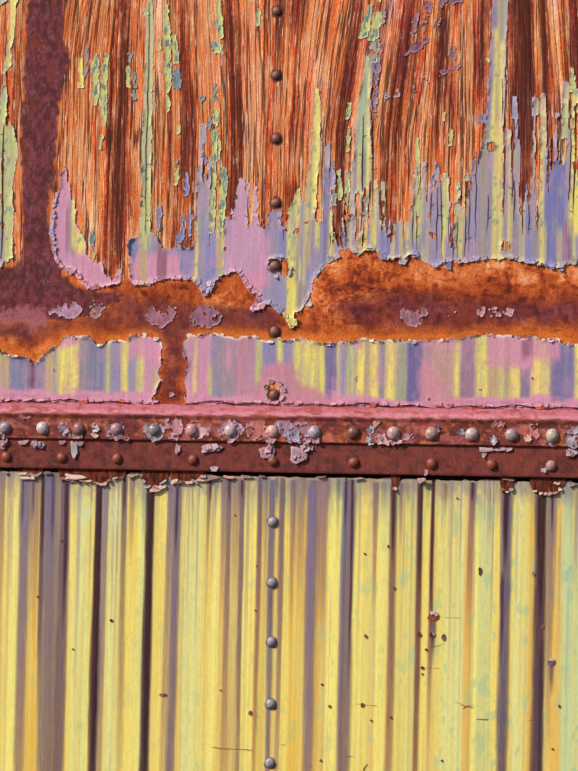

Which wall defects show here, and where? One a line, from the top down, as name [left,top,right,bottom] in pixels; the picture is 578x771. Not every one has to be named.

rust [21,0,70,277]
peeling [0,0,578,404]
peeling [18,440,46,449]
peeling [58,421,129,459]
peeling [142,418,320,464]
peeling [366,421,414,446]
peeling [479,420,513,458]
peeling [524,423,554,447]
peeling [563,426,578,457]
peeling [3,466,266,492]
peeling [500,477,516,493]
peeling [529,468,576,496]